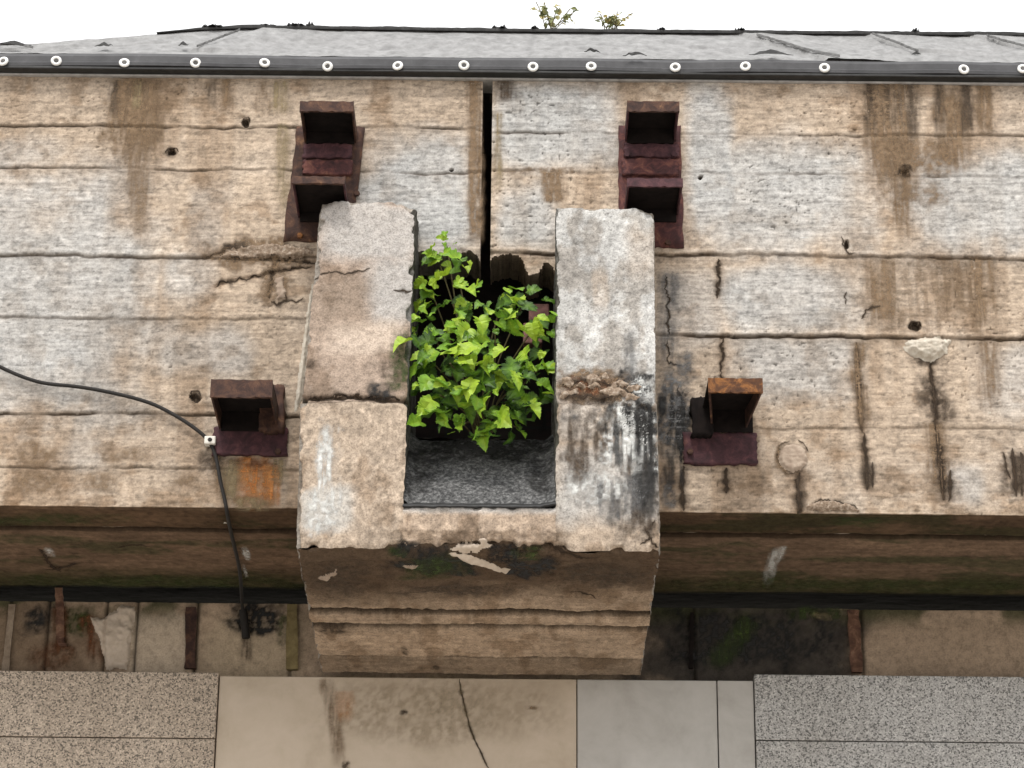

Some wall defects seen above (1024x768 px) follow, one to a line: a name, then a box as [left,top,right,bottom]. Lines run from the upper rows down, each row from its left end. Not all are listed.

damp [101,80,170,220]
damp [865,84,992,229]
crack [215,256,370,306]
crack [714,259,722,298]
spalling [558,369,642,405]
crack [844,292,880,490]
rust [223,457,283,510]
damp [637,413,656,506]
crack [929,363,953,502]
spalling [318,566,362,595]
spalling [390,538,637,597]
spalling [319,622,345,633]